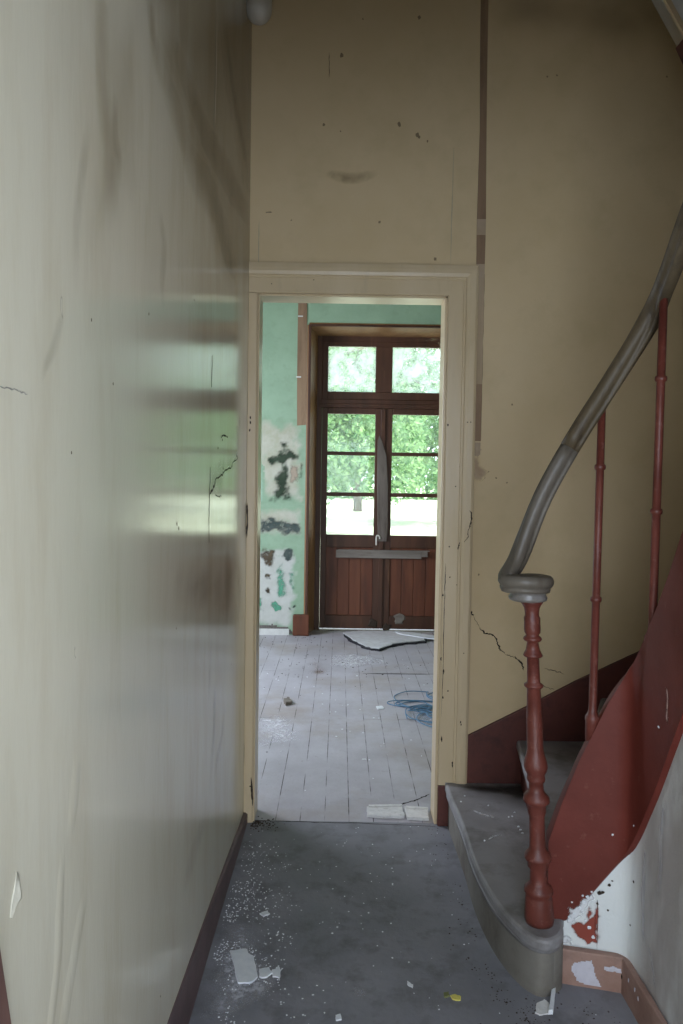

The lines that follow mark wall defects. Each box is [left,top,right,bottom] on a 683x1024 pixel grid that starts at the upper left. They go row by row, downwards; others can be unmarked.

crack [209,435,238,516]
peeling [246,415,306,634]
crack [471,611,561,689]
peeling [563,880,613,944]
peeling [572,960,638,999]